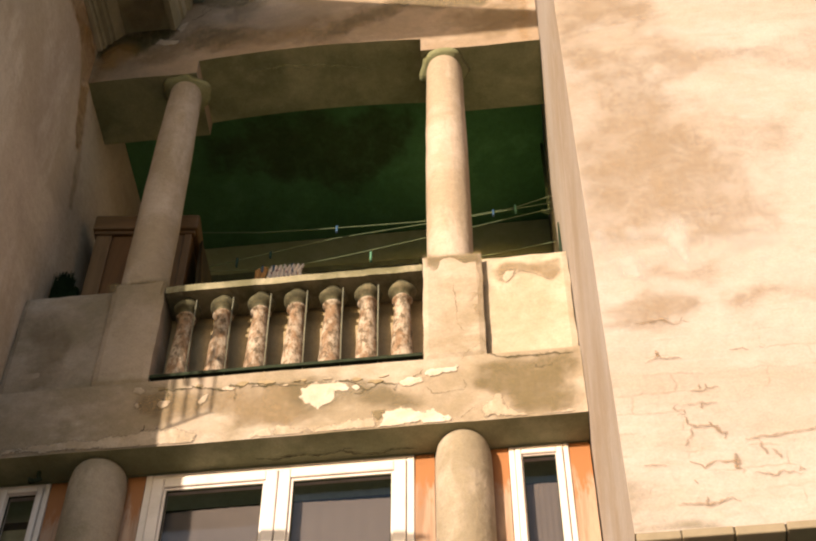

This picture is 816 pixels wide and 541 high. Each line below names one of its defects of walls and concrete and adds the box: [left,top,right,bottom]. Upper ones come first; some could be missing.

damp [97,16,366,62]
flaking render [222,375,389,410]
flaking render [399,365,458,386]
damp [476,355,573,410]
flaking render [250,406,452,437]
crack [675,384,804,505]